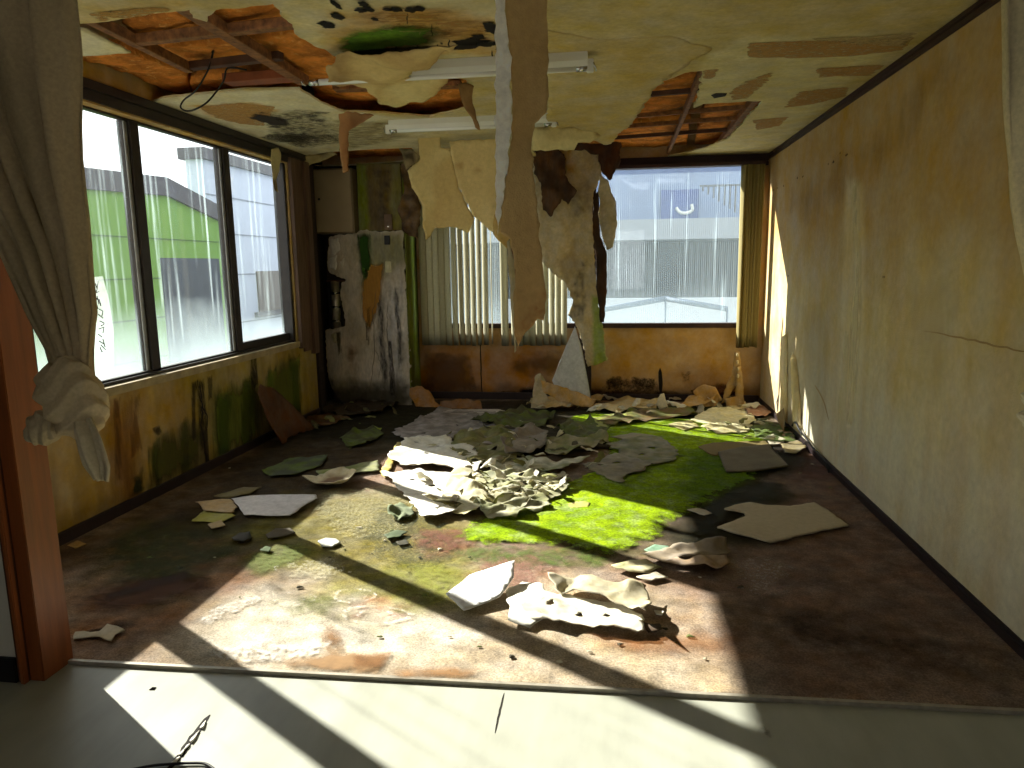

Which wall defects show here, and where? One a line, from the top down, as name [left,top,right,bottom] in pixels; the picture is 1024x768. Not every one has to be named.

water stain [316,0,497,54]
peeling [730,73,771,100]
water stain [249,111,395,147]
peeling [533,149,577,217]
crack [925,331,1024,352]
water stain [115,355,301,496]